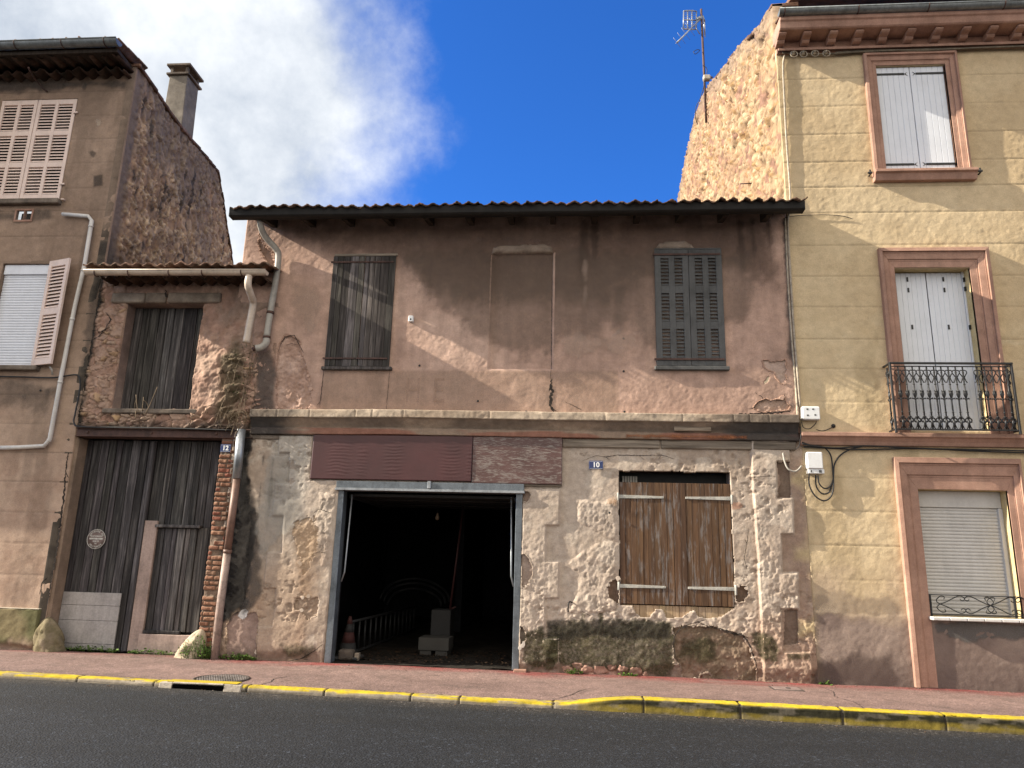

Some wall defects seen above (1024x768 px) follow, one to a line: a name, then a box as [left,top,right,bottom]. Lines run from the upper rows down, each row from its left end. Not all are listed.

crack [549,258,580,412]
peeling [752,358,792,413]
spalling [521,553,535,589]
spalling [607,576,622,605]
spalling [734,585,750,604]